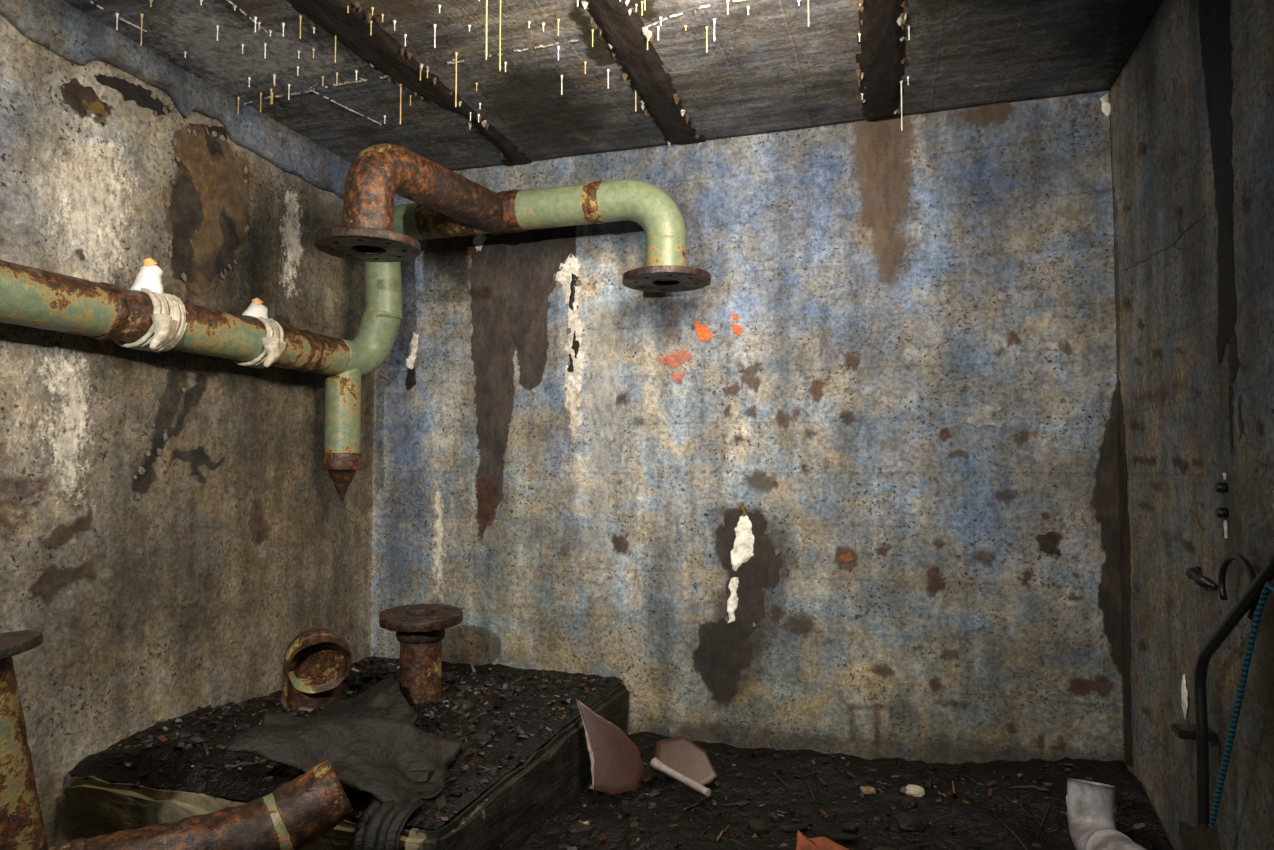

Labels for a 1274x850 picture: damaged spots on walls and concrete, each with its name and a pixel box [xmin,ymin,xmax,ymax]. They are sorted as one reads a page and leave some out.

peeling [581,0,616,57]
peeling [641,26,654,42]
peeling [897,1,908,41]
water stain [1072,0,1161,116]
spalling [61,74,174,126]
water stain [1198,0,1243,453]
rust [695,319,713,341]
rust [730,312,742,336]
water stain [469,225,577,539]
rust [659,349,692,383]
spalling [747,470,778,490]
spalling [727,502,754,623]